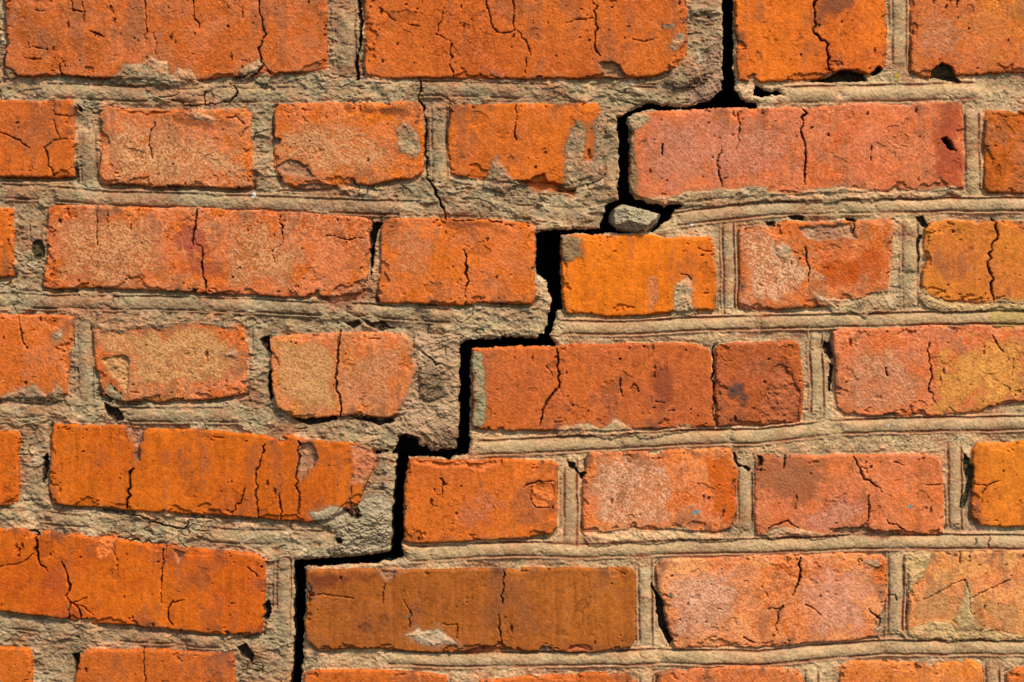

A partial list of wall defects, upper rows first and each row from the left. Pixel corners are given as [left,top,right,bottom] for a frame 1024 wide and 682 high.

crack [799,111,807,175]
spalling [525,174,575,196]
crack [192,210,204,274]
crack [988,219,997,288]
crack [291,0,782,682]
spalling [102,355,130,393]
crack [238,441,301,517]
spalling [298,442,318,480]
spalling [348,444,377,513]